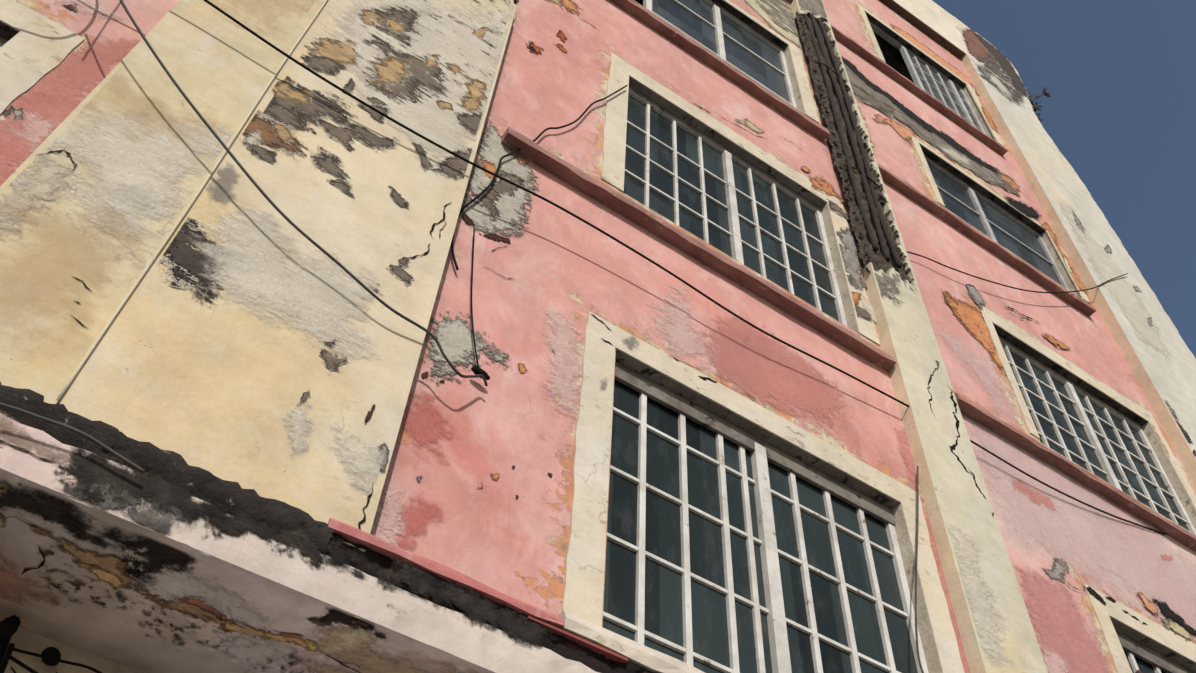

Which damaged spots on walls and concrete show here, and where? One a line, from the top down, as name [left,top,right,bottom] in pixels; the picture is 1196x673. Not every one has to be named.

peeling [0,0,539,305]
spalling [745,0,1042,322]
flaking render [21,526,399,670]
damp [0,414,554,654]
crack [316,648,361,673]
flaking render [358,442,390,544]
damp [403,391,453,463]
crack [927,367,985,497]
flaking render [1137,592,1196,641]